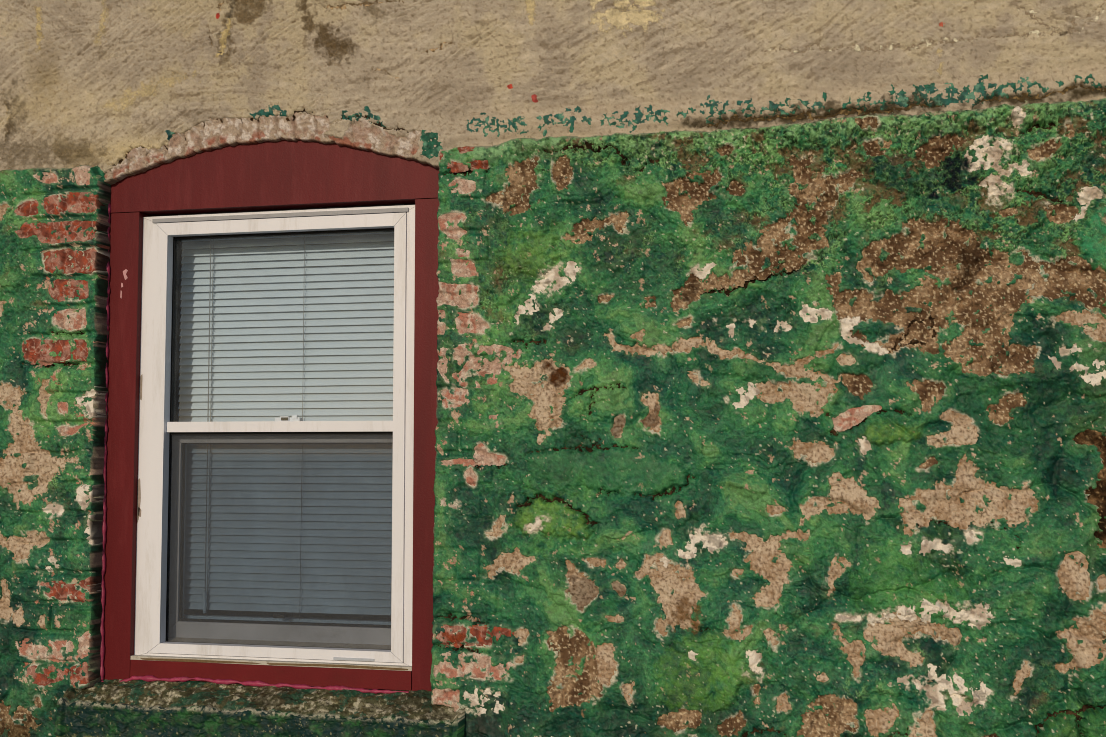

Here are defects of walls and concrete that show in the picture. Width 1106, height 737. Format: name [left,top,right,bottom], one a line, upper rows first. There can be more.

water stain [216,0,272,62]
water stain [299,0,354,65]
flaking render [104,112,421,181]
peeling [436,213,597,445]
crack [513,339,546,349]
flaking render [603,145,1106,455]
peeling [0,382,79,517]
crack [531,383,638,453]
crack [517,474,695,527]
peeling [565,440,881,636]
peeling [896,379,1039,556]
peeling [832,598,995,737]